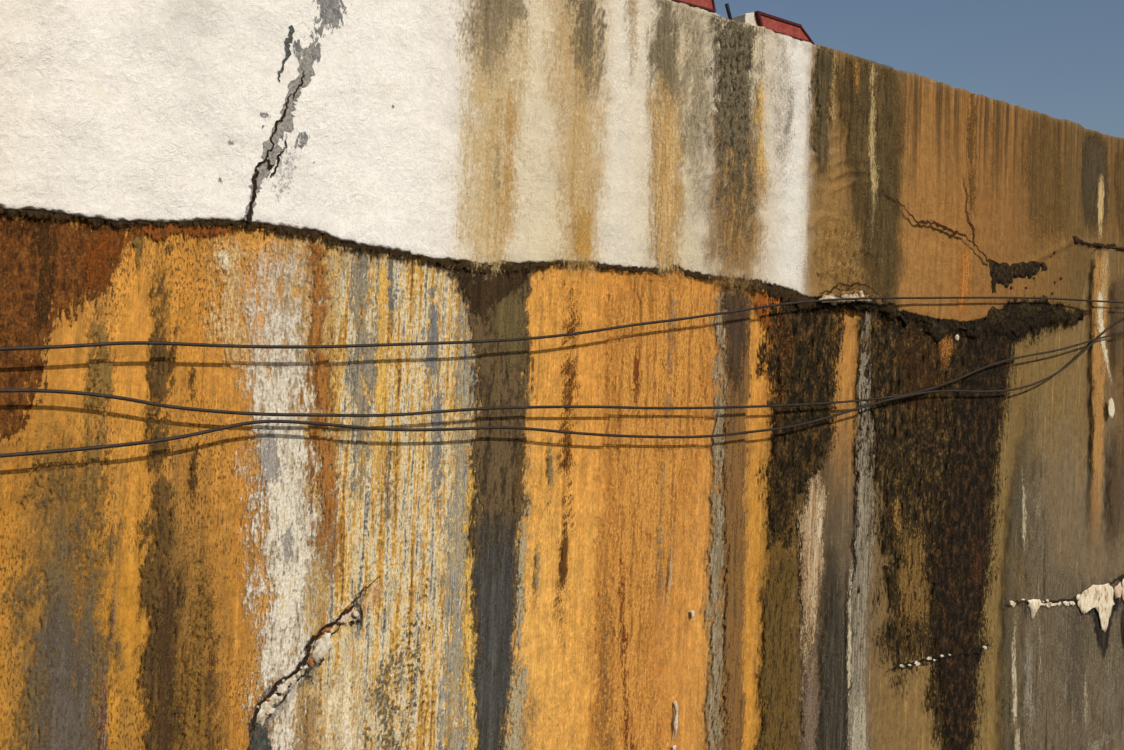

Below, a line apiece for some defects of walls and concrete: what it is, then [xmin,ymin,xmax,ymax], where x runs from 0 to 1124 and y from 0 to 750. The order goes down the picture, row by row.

rust [0,210,240,451]
damp [3,0,545,750]
crack [244,0,347,223]
damp [547,0,607,649]
damp [624,0,1124,750]
crack [883,179,992,263]
crack [1072,235,1124,250]
rust [588,269,719,750]
crack [247,577,386,750]